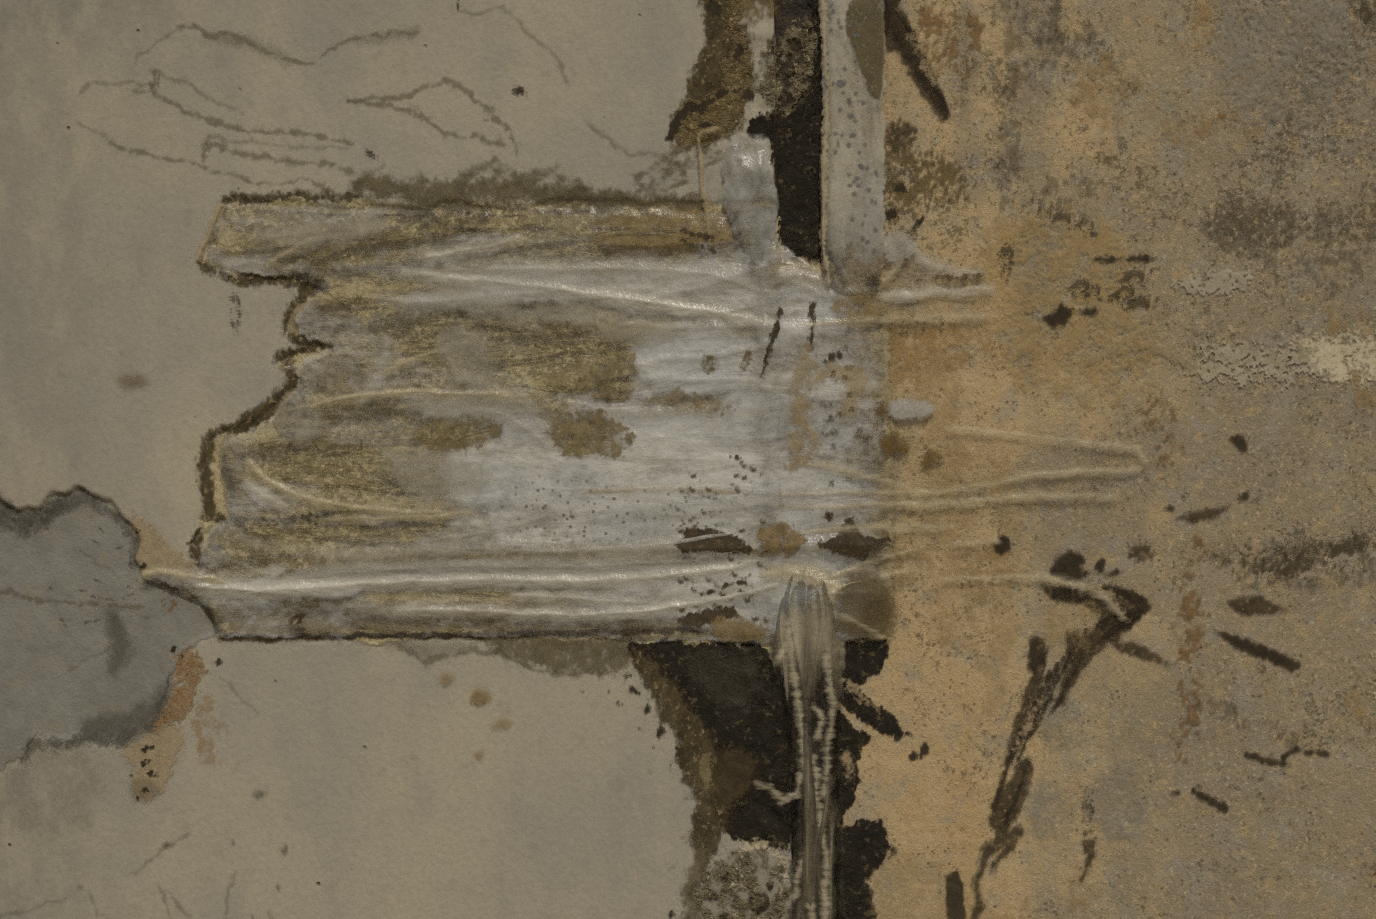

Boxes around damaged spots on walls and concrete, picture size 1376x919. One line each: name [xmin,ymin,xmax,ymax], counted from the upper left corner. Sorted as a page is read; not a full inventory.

leakage [883,138,971,233]
leakage [1171,263,1267,301]
leakage [1086,328,1376,392]
peeling [0,187,787,770]
leakage [1221,534,1375,579]
spalling [130,745,156,777]
peeling [699,753,712,792]
leakage [971,662,1060,919]
leakage [669,850,707,919]